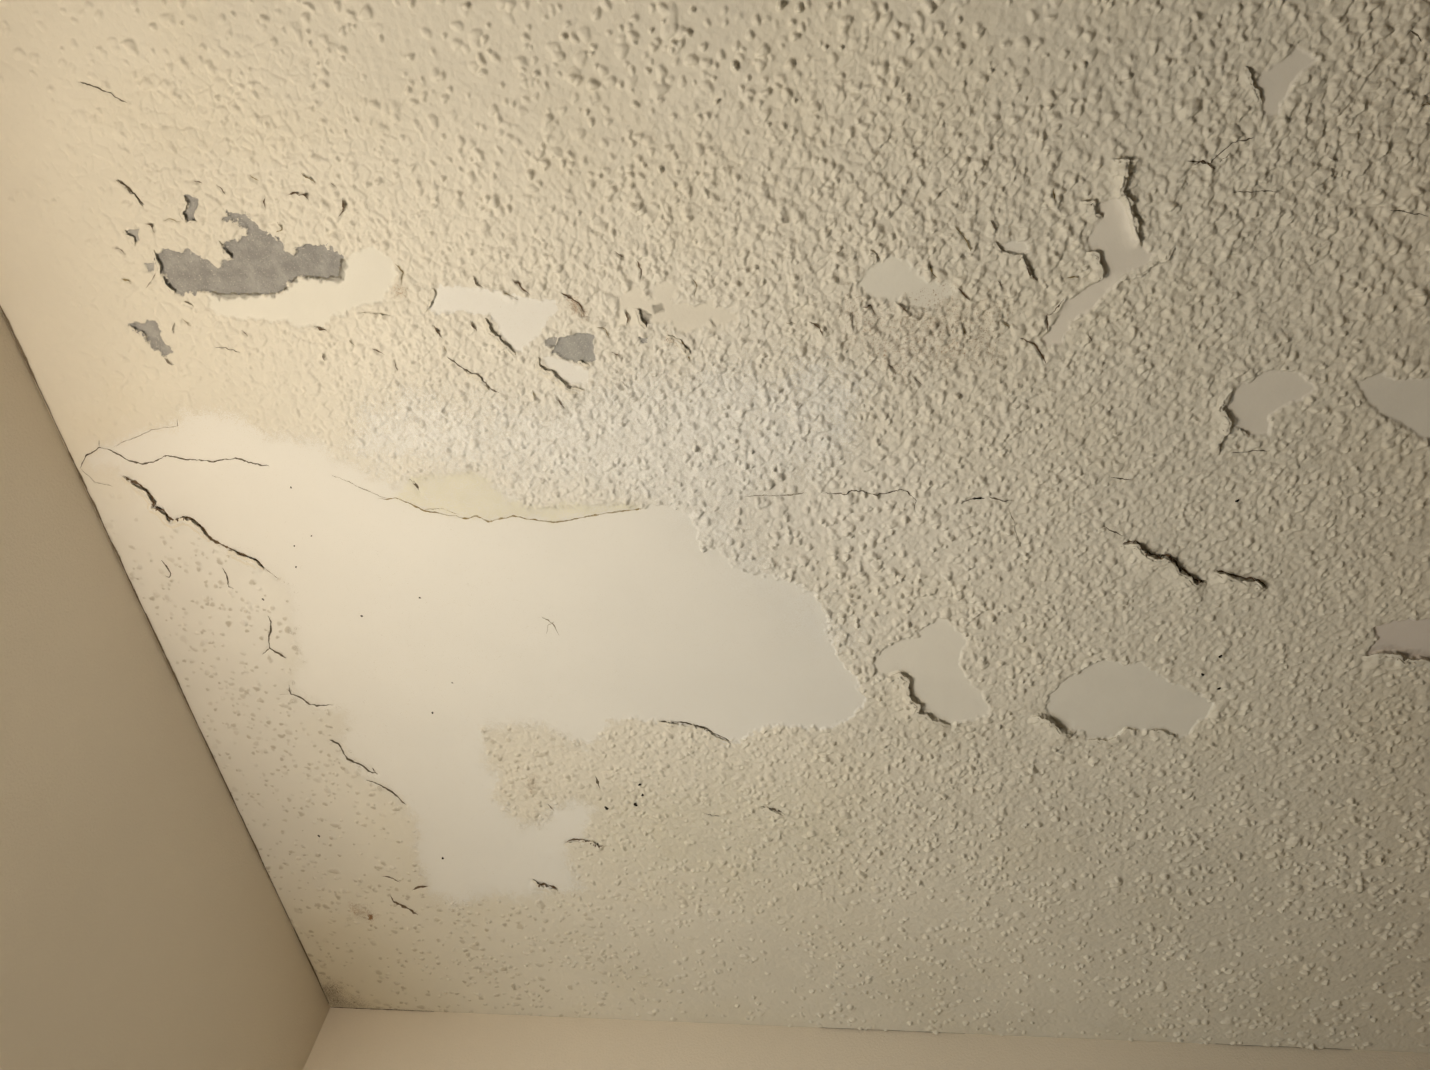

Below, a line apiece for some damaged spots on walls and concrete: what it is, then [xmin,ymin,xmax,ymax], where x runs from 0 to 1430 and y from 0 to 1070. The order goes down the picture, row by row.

crack [81,82,127,103]
crack [116,180,144,207]
spalling [116,181,404,365]
peeling [423,253,741,408]
peeling [850,250,969,328]
peeling [1021,159,1176,363]
peeling [1211,370,1316,456]
crack [1103,526,1266,590]
crack [0,306,434,1012]
peeling [1363,618,1430,669]
peeling [1032,658,1215,747]